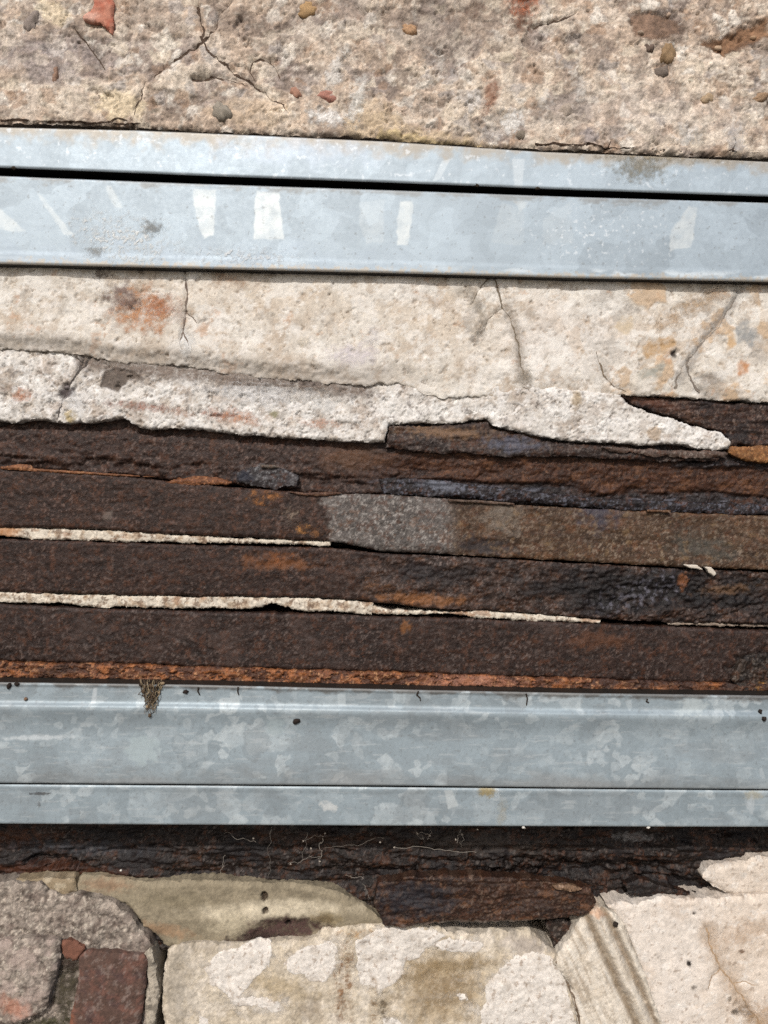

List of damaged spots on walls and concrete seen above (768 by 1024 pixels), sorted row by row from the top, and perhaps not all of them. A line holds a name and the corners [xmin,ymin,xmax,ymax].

crack [0,2,287,125]
rust [102,284,168,333]
crack [179,272,196,354]
crack [473,279,527,389]
crack [674,296,737,393]
peeling [601,445,768,464]
peeling [553,883,582,892]